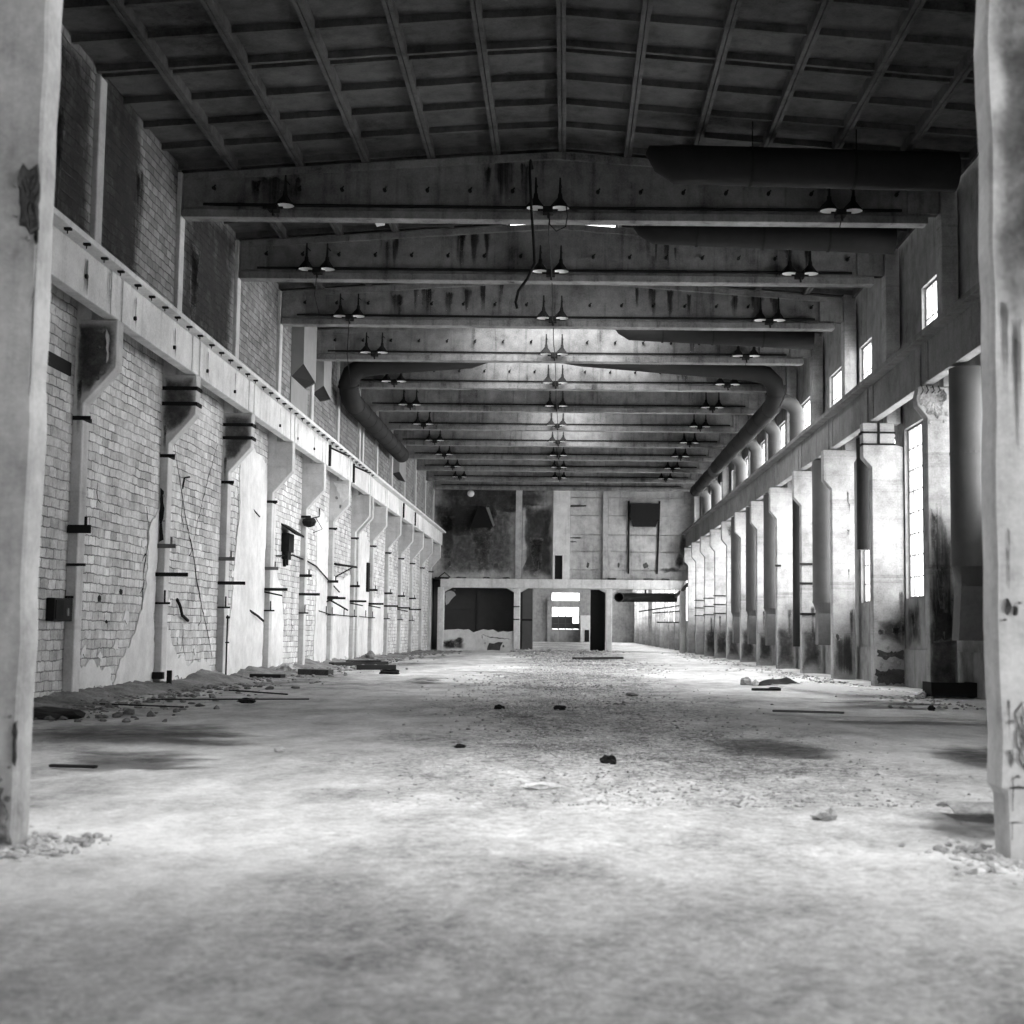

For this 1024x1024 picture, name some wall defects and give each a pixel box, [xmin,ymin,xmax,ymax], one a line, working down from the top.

damp [486,163,528,197]
damp [457,234,489,262]
damp [446,286,485,307]
damp [636,288,673,315]
damp [931,510,951,622]
flaking render [79,488,212,689]
spalling [875,646,904,685]